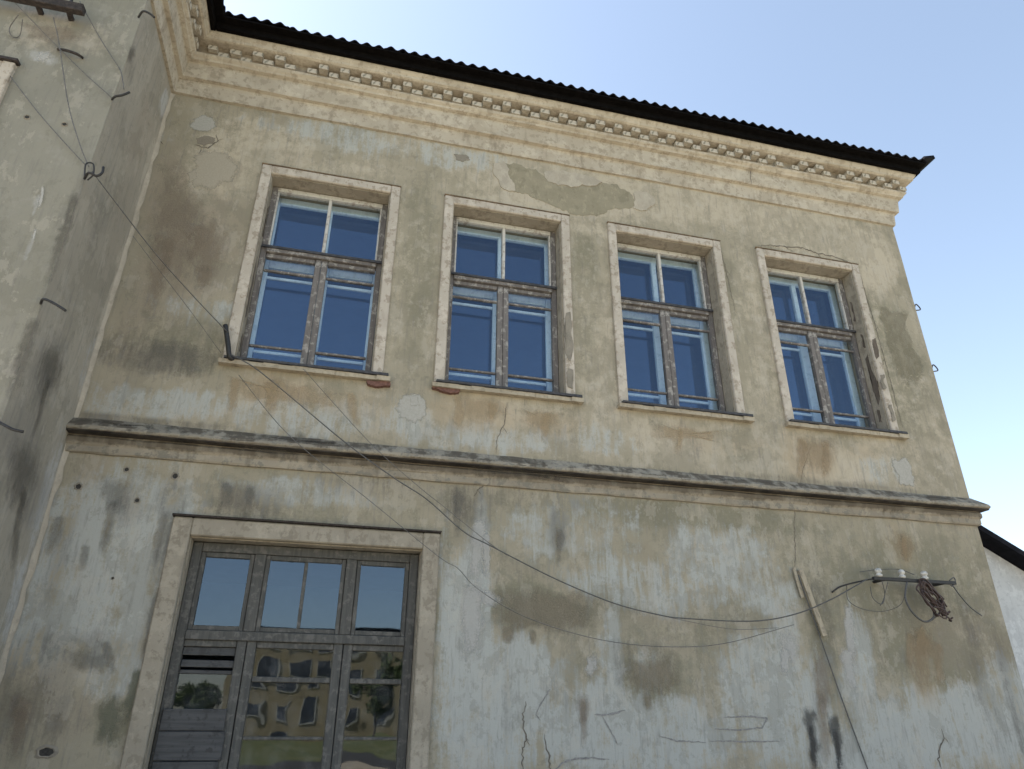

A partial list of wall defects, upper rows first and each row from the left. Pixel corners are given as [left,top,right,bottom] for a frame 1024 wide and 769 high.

peeling [493,161,655,216]
peeling [396,381,461,424]
water stain [462,521,585,653]
crack [521,701,551,769]